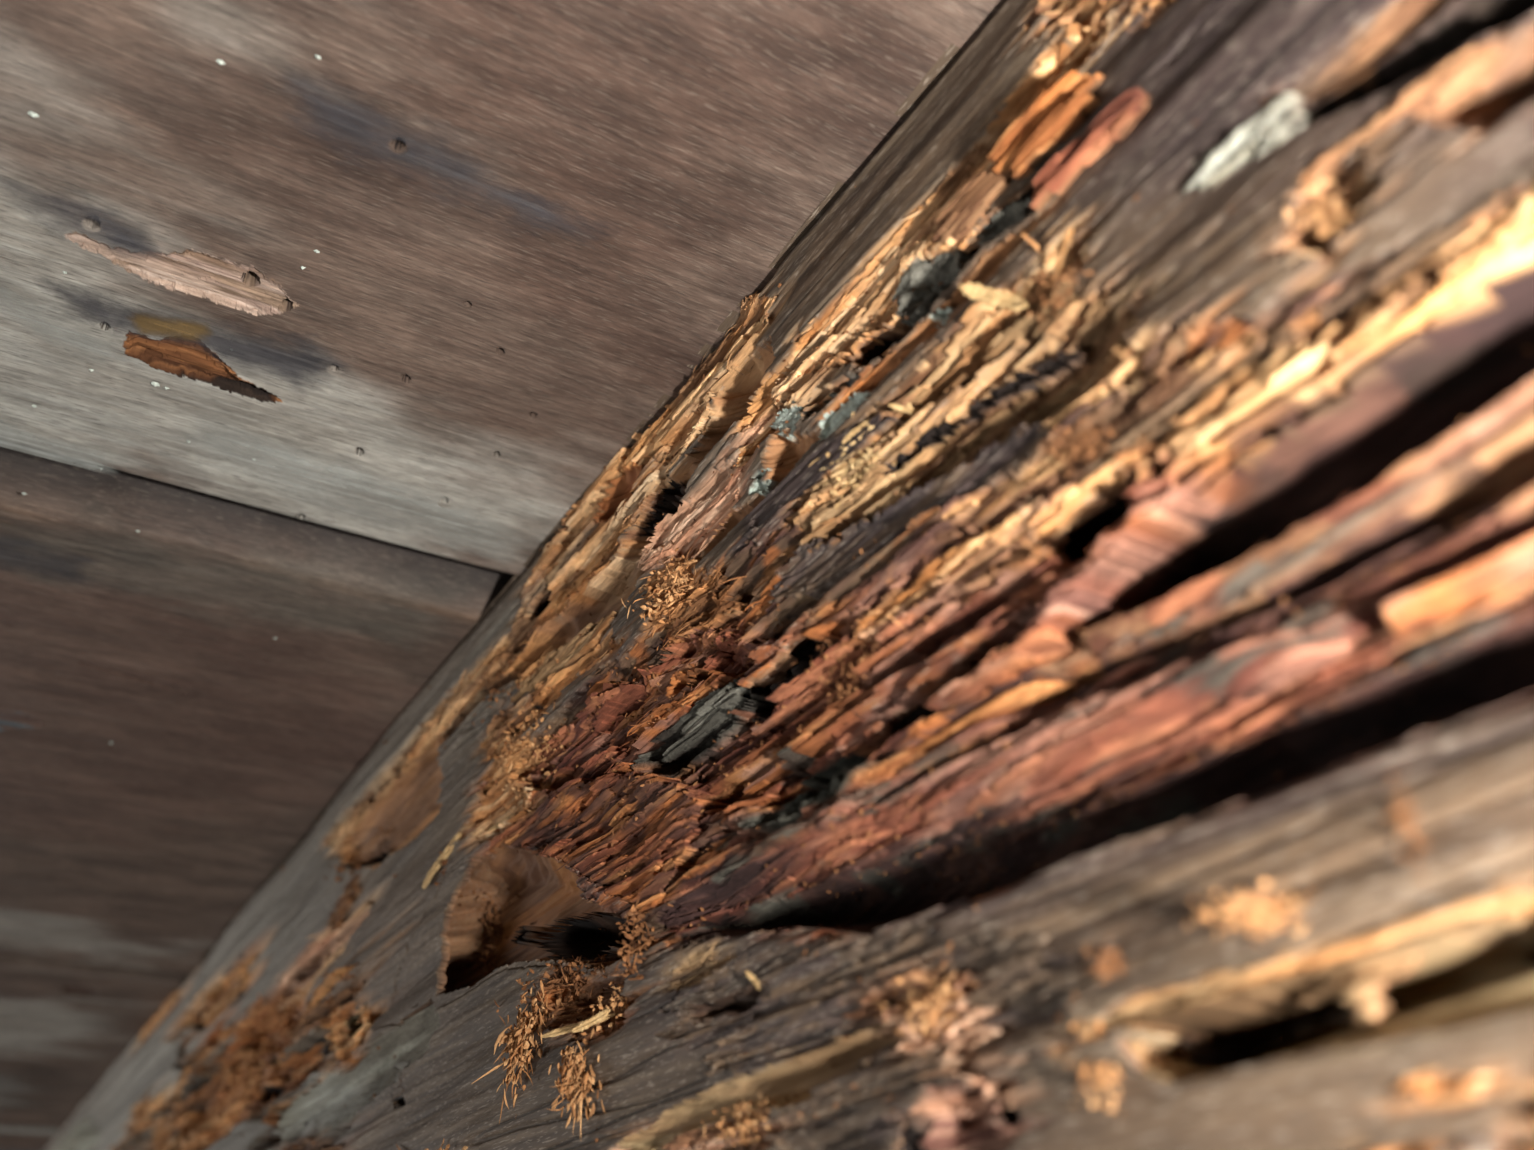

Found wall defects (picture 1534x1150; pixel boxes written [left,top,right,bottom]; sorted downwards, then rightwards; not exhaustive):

spalling [325,0,1534,1150]
spalling [113,955,259,1150]
spalling [237,964,377,1150]